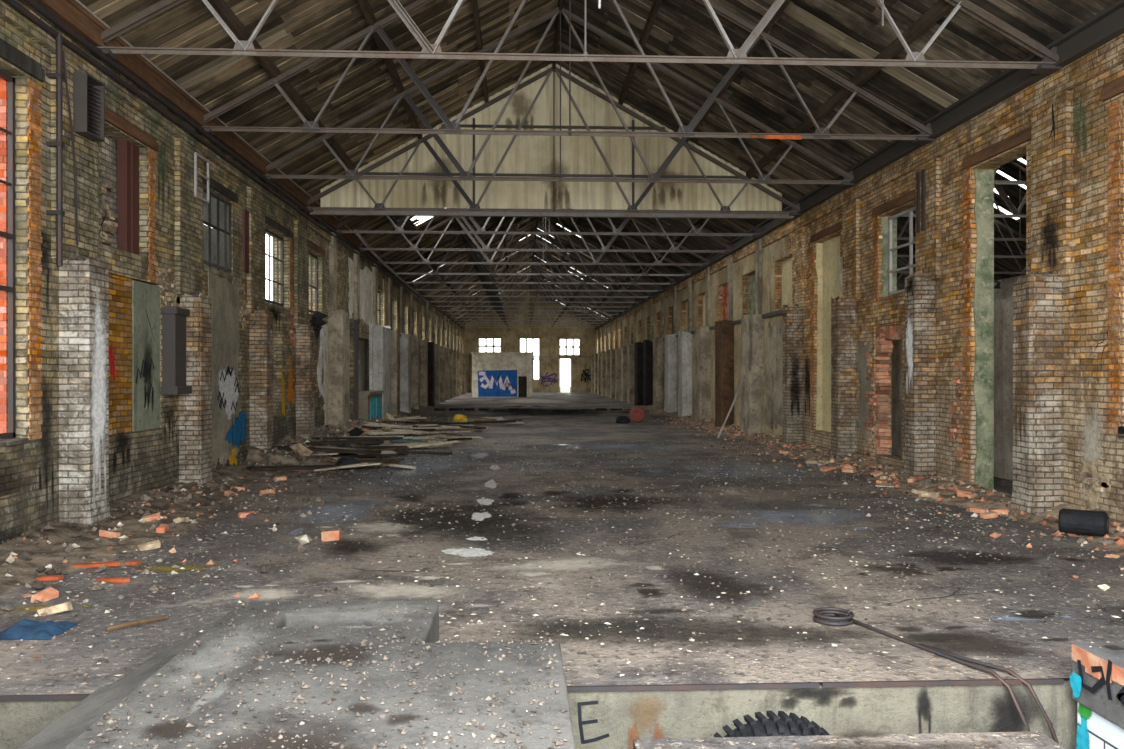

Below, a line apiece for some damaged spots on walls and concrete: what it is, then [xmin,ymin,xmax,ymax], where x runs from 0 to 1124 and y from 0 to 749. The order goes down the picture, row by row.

damp [824,691,958,749]